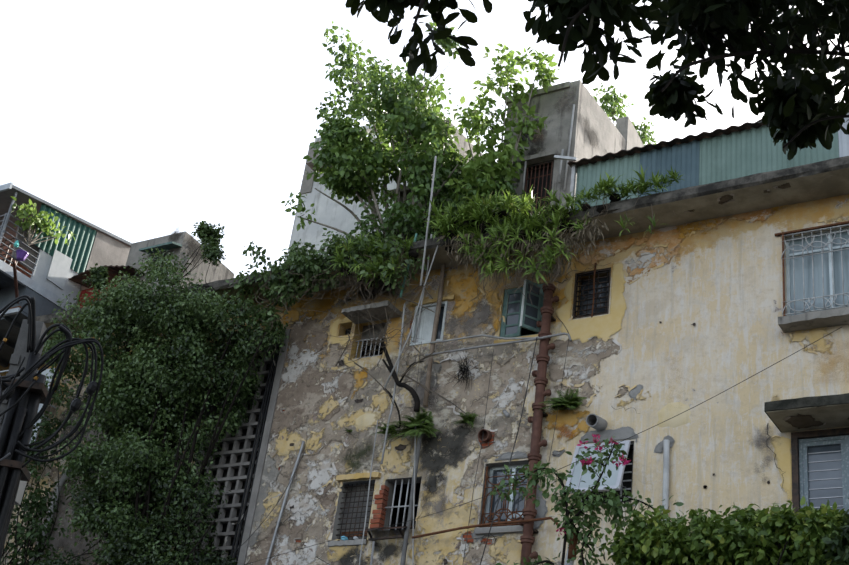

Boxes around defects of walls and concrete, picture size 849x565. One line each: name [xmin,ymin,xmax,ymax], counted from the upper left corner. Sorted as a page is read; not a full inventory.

water stain [579,113,607,153]
flaking render [245,287,622,565]
water stain [419,425,475,516]
flaking render [615,384,644,402]